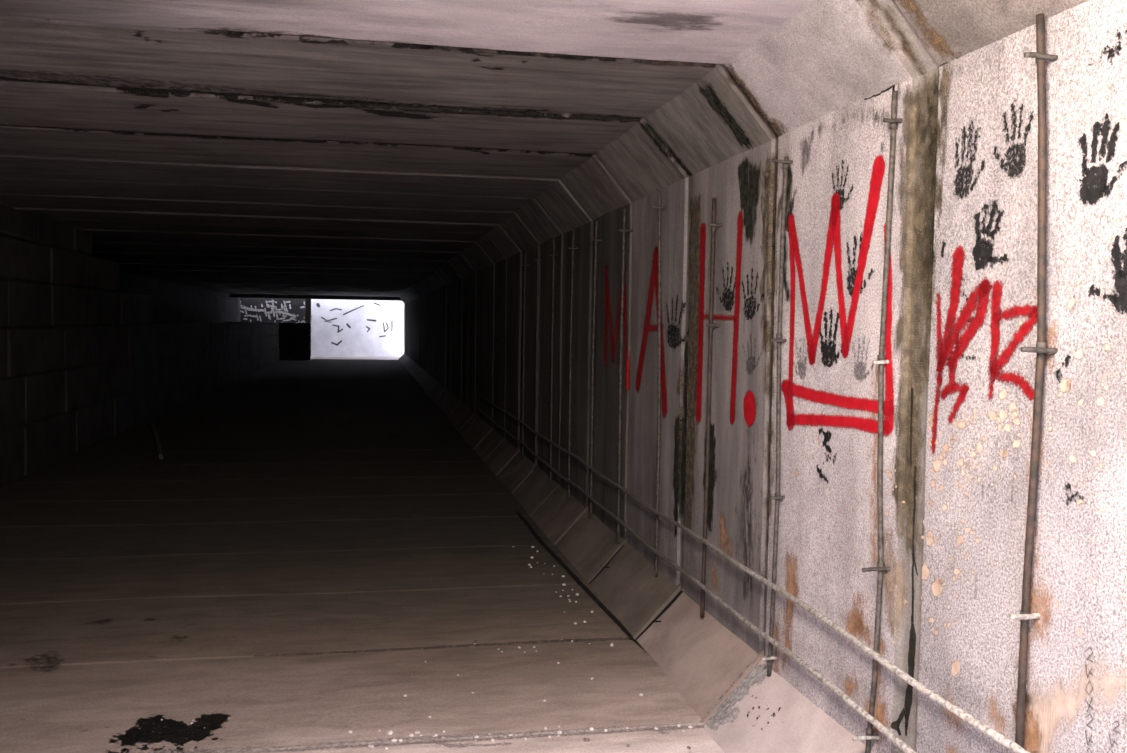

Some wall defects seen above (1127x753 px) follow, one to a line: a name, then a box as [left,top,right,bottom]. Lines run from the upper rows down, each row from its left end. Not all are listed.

water stain [627,58,696,66]
water stain [640,122,692,176]
water stain [712,63,785,136]
water stain [673,197,717,536]
water stain [699,83,820,542]
water stain [869,0,954,555]
water stain [743,460,760,599]